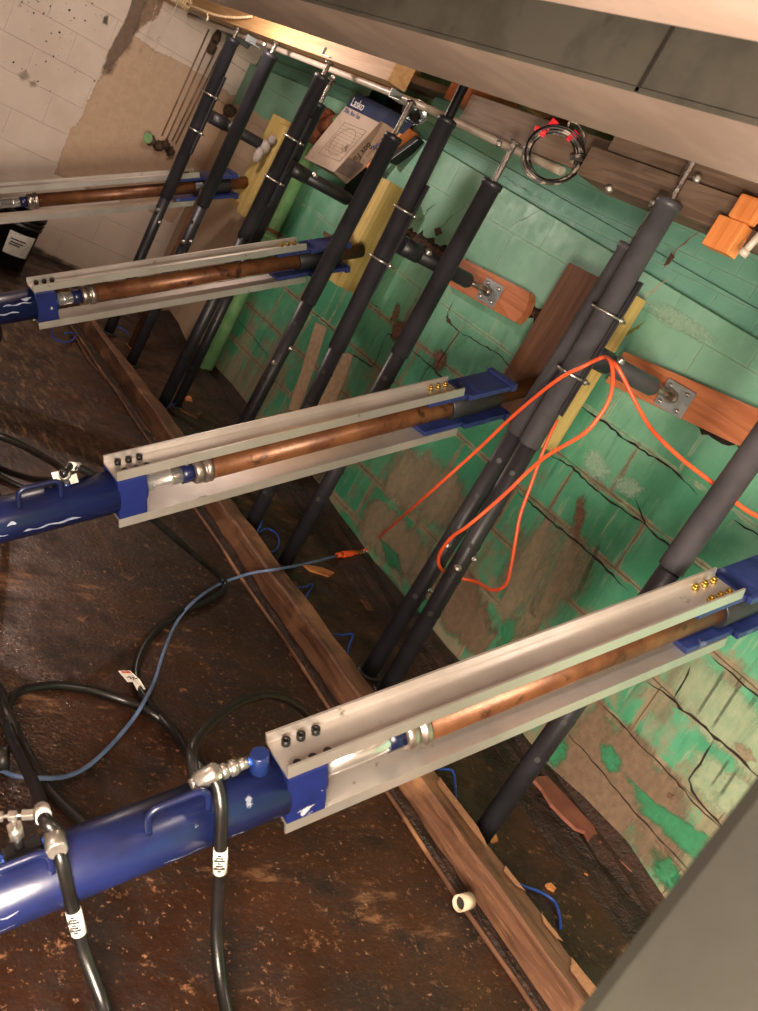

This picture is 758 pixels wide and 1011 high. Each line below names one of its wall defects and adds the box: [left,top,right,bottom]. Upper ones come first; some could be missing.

crack [405,205,484,269]
crack [529,305,542,323]
crack [582,407,696,493]
crack [697,426,739,448]
peeling [358,449,464,586]
peeling [441,517,591,655]
crack [518,493,624,587]
crack [546,453,670,546]
crack [712,657,758,697]
crack [568,734,687,868]
peeling [533,663,758,890]
crack [600,667,758,826]